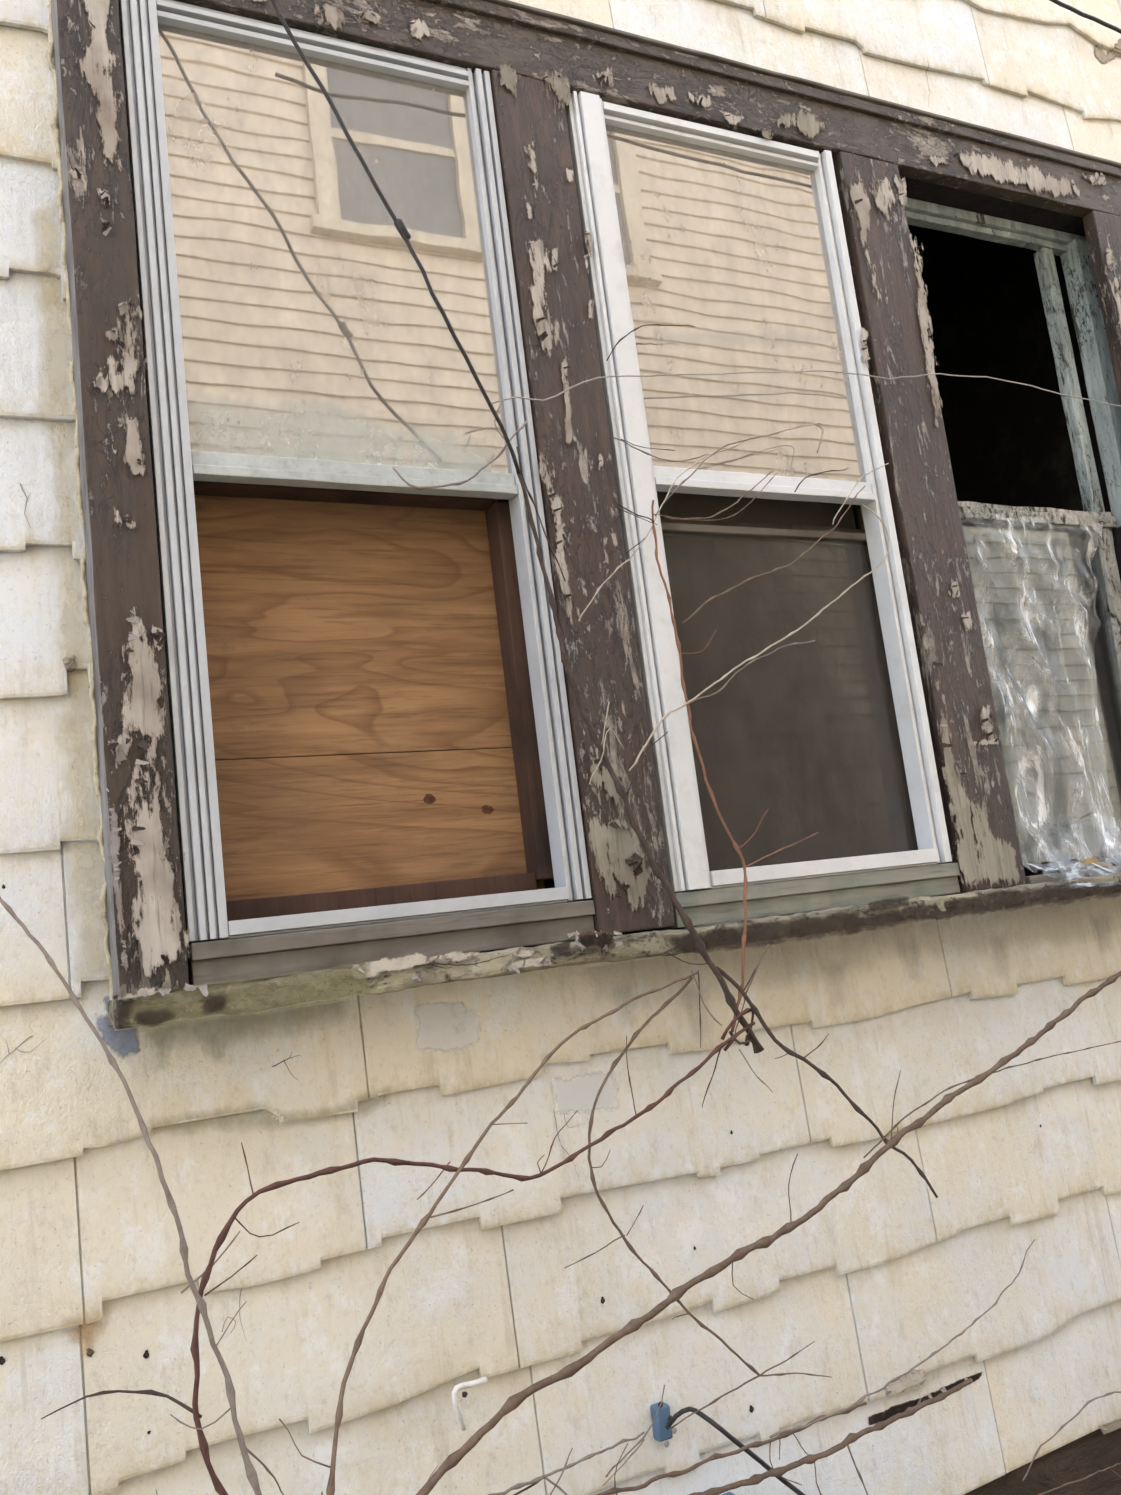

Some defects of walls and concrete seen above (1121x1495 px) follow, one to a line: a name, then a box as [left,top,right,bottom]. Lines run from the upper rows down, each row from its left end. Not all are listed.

peeling [79,0,124,173]
peeling [648,83,744,125]
peeling [850,174,908,301]
peeling [929,150,1107,197]
peeling [528,237,577,444]
peeling [908,230,943,427]
peeling [122,416,146,476]
peeling [538,451,574,625]
peeling [106,606,208,1000]
peeling [587,753,652,912]
peeling [927,658,1021,888]
peeling [351,946,551,982]